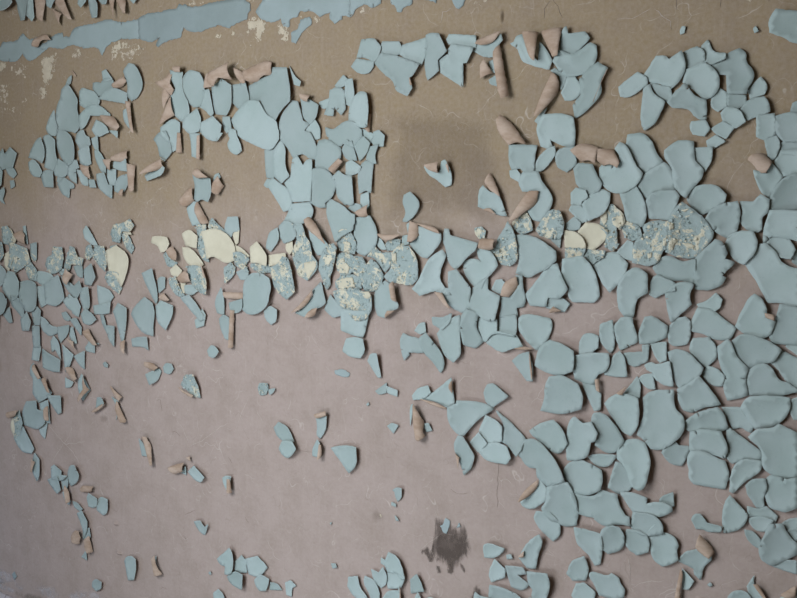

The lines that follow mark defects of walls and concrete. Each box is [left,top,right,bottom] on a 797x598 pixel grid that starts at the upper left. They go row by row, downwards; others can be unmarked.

peeling [0,0,412,62]
peeling [768,9,797,43]
peeling [0,147,17,204]
peeling [28,63,143,198]
peeling [0,219,134,481]
peeling [131,26,797,598]
peeling [48,465,108,560]
leakage [422,521,466,573]